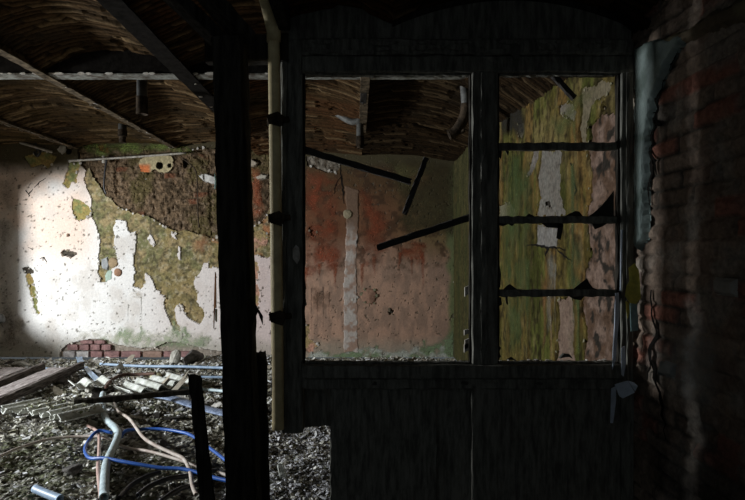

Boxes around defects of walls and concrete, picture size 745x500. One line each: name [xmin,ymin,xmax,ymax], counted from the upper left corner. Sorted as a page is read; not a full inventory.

flaking render [62,140,219,331]
flaking render [250,149,270,326]
peeling [499,201,516,216]
peeling [527,150,566,216]
peeling [537,225,558,247]
flaking render [555,80,616,361]
flaking render [60,339,222,357]
crack [647,290,666,440]